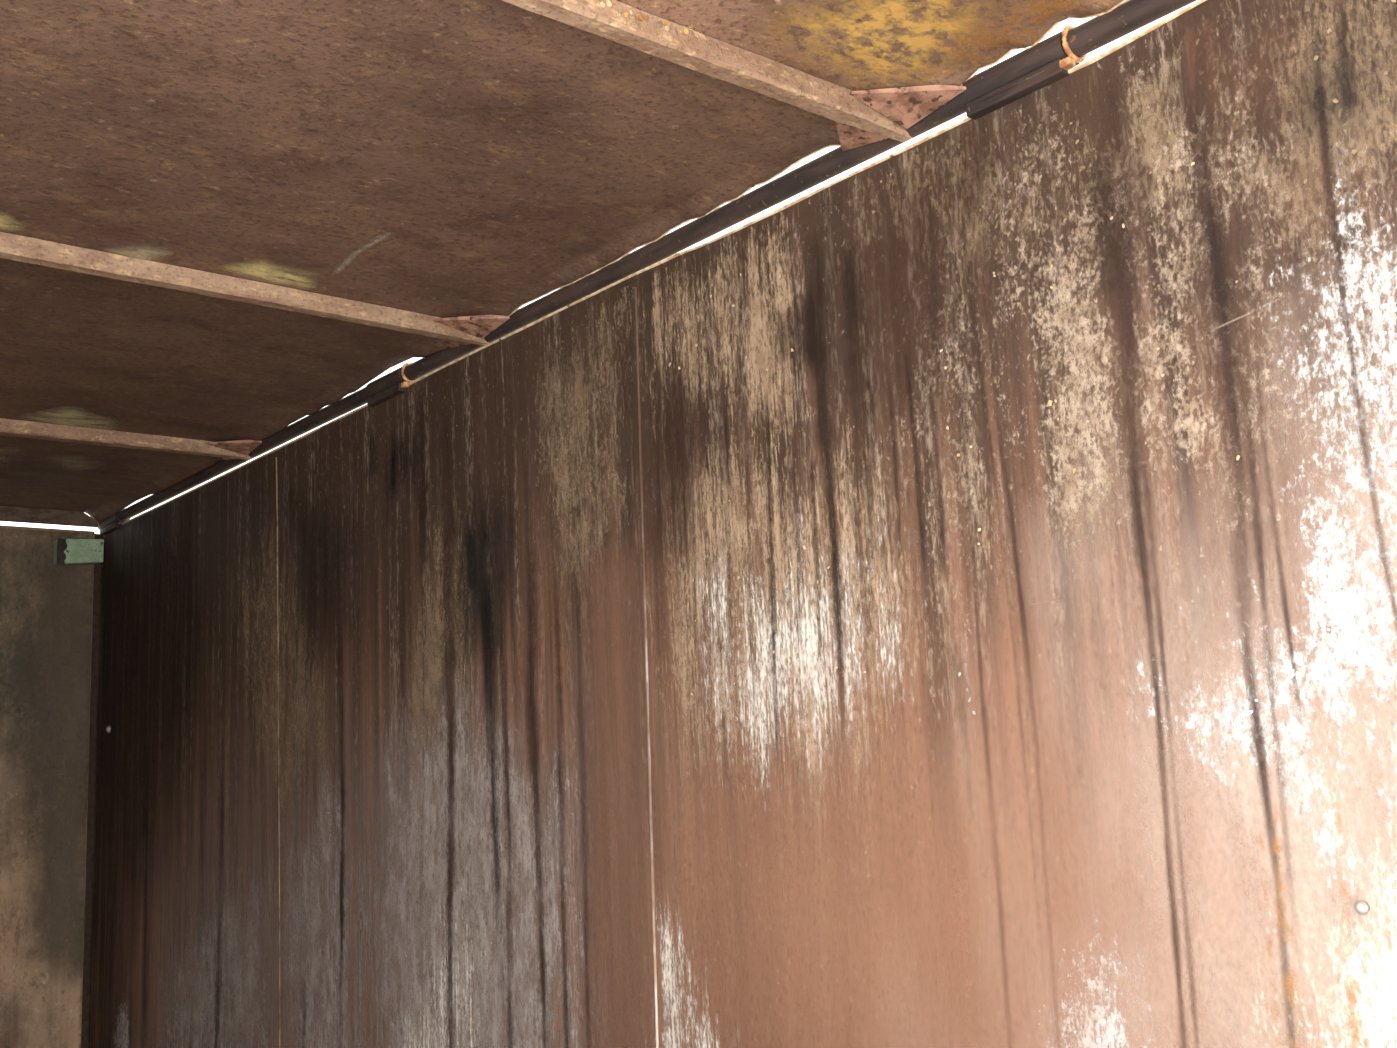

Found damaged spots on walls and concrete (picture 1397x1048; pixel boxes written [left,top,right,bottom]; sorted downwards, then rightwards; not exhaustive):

corrosion [795,0,1070,80]
water stain [1319,104,1336,240]
water stain [780,265,843,698]
water stain [1104,130,1397,1048]
water stain [977,636,990,777]